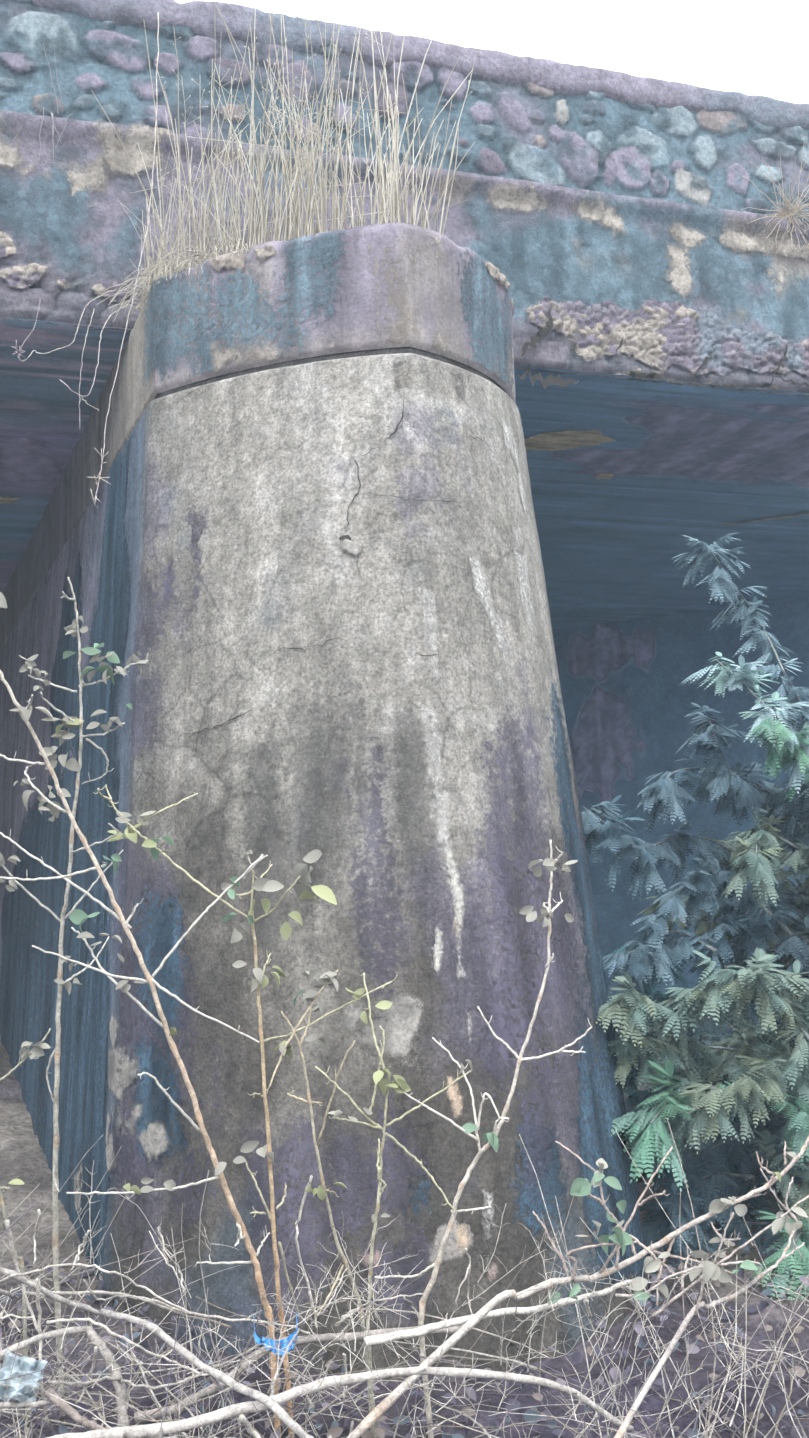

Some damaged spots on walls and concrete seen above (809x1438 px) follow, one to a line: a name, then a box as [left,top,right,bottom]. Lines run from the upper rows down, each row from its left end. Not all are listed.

spalling [0,230,129,302]
leakage [138,230,347,412]
leakage [368,192,612,394]
peeling [487,181,625,235]
spalling [485,221,809,390]
leakage [626,236,752,321]
crack [344,386,469,579]